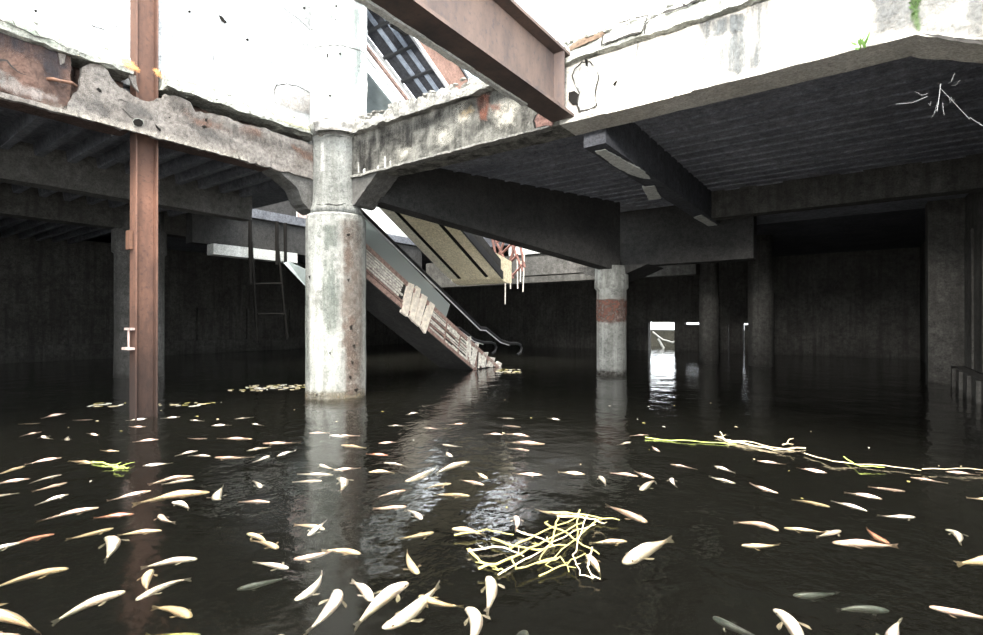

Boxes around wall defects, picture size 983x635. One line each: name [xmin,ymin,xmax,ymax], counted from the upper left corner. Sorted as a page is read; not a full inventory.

spalling [0,32,78,109]
flaking render [550,28,606,50]
crack [572,0,698,112]
water stain [700,3,762,74]